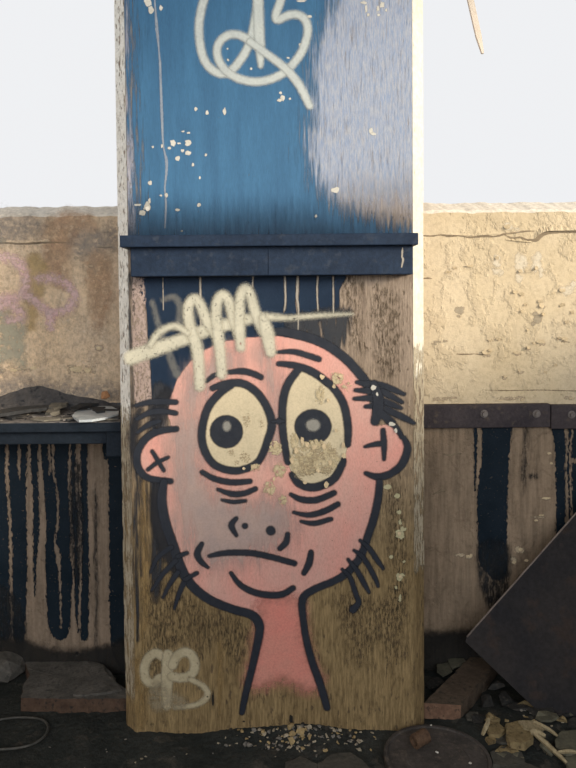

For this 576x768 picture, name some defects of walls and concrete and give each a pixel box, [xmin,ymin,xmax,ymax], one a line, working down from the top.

spalling [152,131,194,166]
crack [423,224,576,243]
peeling [395,0,457,573]
peeling [263,433,346,505]